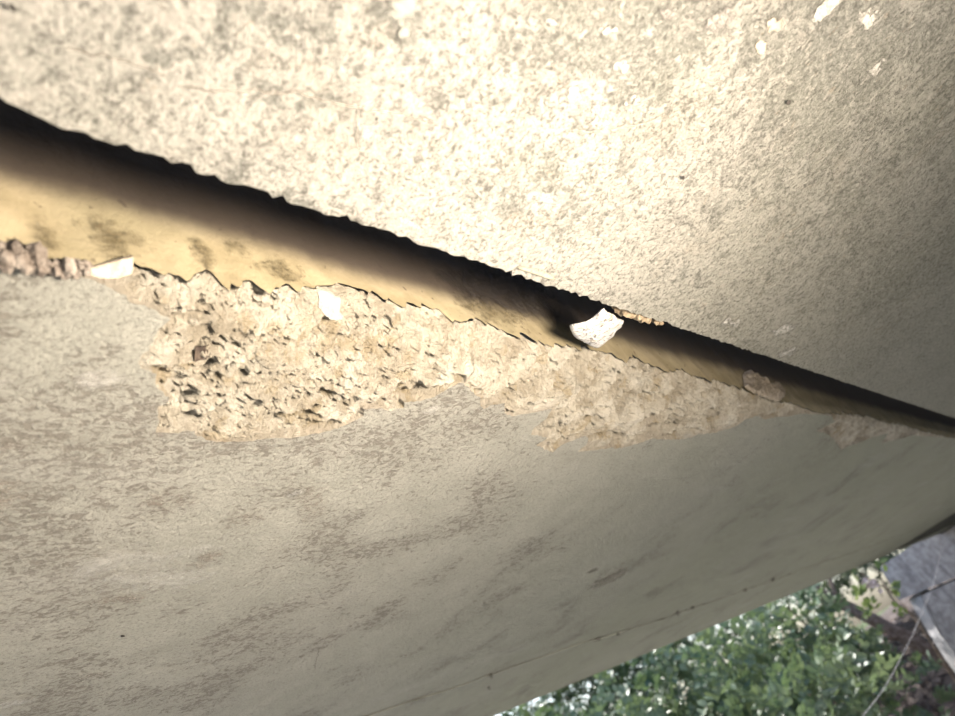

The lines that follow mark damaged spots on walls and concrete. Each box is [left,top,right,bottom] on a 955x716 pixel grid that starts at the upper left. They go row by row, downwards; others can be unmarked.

spalling [0,237,954,453]